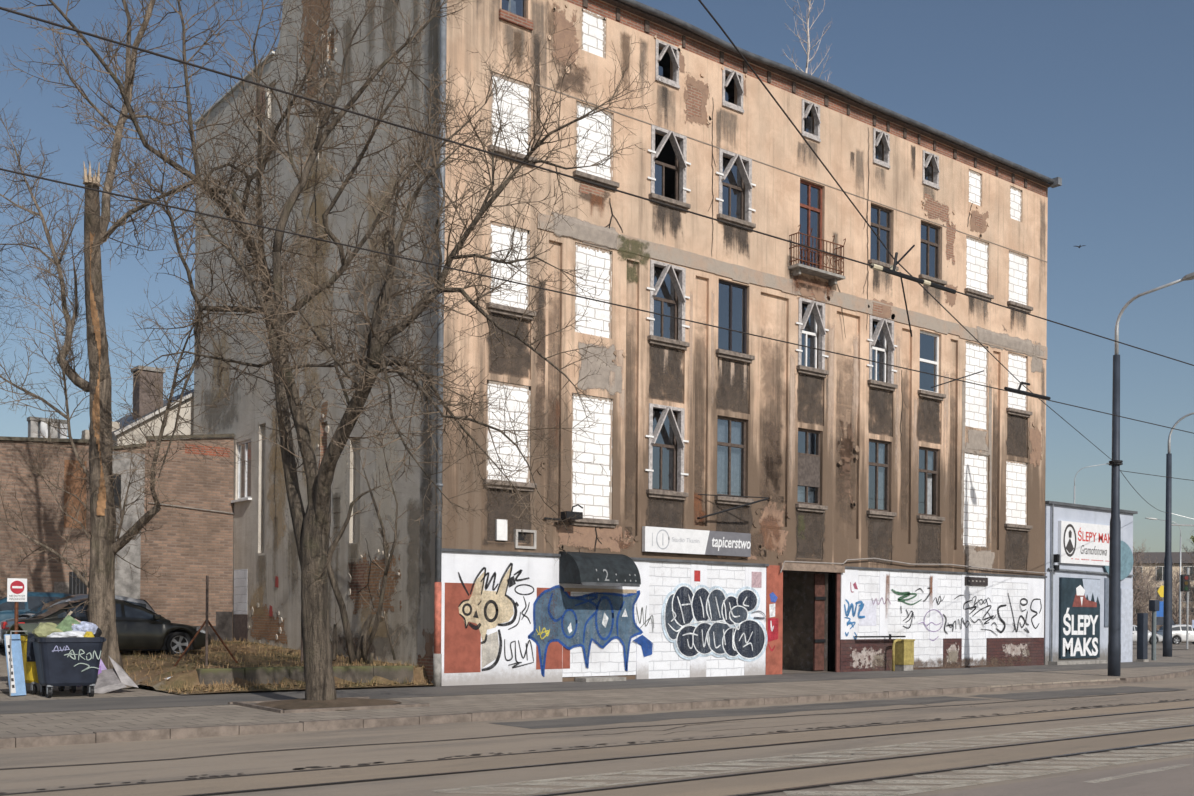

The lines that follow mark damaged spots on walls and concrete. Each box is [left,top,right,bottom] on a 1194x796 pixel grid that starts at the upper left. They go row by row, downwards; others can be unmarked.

spalling [299,0,338,105]
peeling [548,3,587,92]
peeling [677,46,712,128]
leakage [657,206,681,235]
leakage [724,224,748,249]
peeling [921,194,956,265]
peeling [969,205,990,239]
leakage [789,327,834,455]
spalling [347,549,402,617]